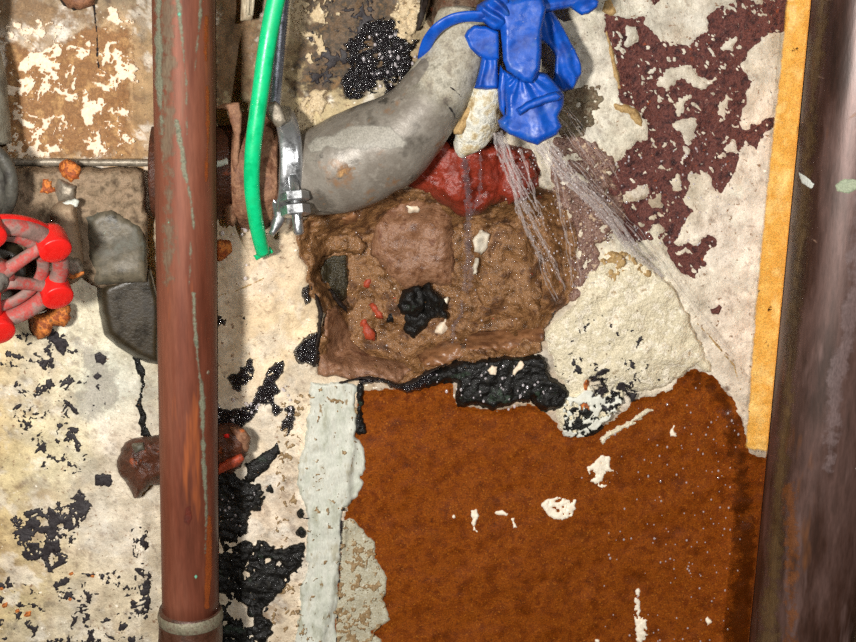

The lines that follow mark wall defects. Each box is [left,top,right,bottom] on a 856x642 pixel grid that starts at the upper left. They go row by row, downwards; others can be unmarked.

peeling [1,19,139,159]
peeling [103,6,143,39]
damp [285,0,417,101]
rust [600,251,652,281]
damp [0,328,117,474]
damp [132,357,151,437]
damp [293,332,319,366]
damp [356,0,827,642]
damp [95,473,113,487]
damp [192,293,306,642]
damp [0,576,45,640]
damp [10,489,152,642]